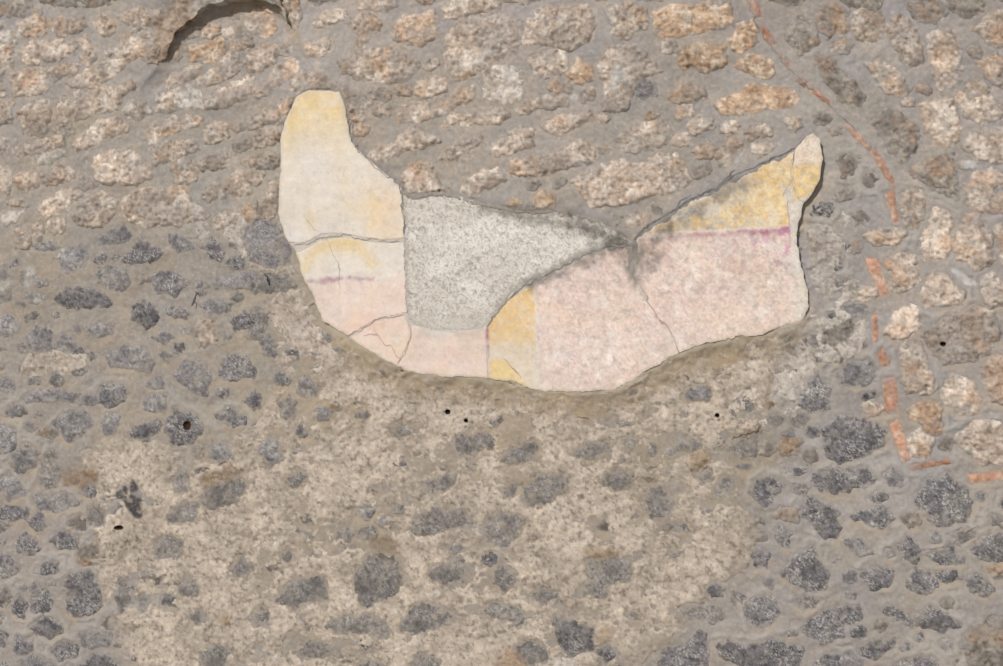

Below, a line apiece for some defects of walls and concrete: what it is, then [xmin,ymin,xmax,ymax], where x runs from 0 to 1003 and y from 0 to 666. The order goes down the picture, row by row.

crack [293,144,406,285]
crack [486,137,805,327]
crack [345,314,411,364]
crack [635,278,679,352]
spalling [78,209,867,666]